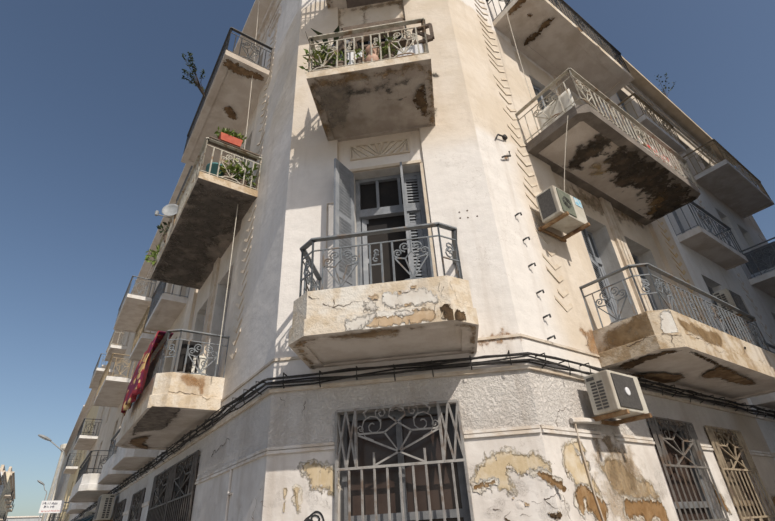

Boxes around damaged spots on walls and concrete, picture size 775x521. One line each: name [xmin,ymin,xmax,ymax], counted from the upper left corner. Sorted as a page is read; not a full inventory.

spalling [223,59,264,81]
water stain [311,64,439,137]
water stain [567,133,696,226]
water stain [155,181,250,287]
peeling [344,285,466,331]
peeling [660,309,678,333]
spalling [619,350,685,383]
spalling [689,352,756,386]
peeling [283,458,341,514]
peeling [470,437,669,521]